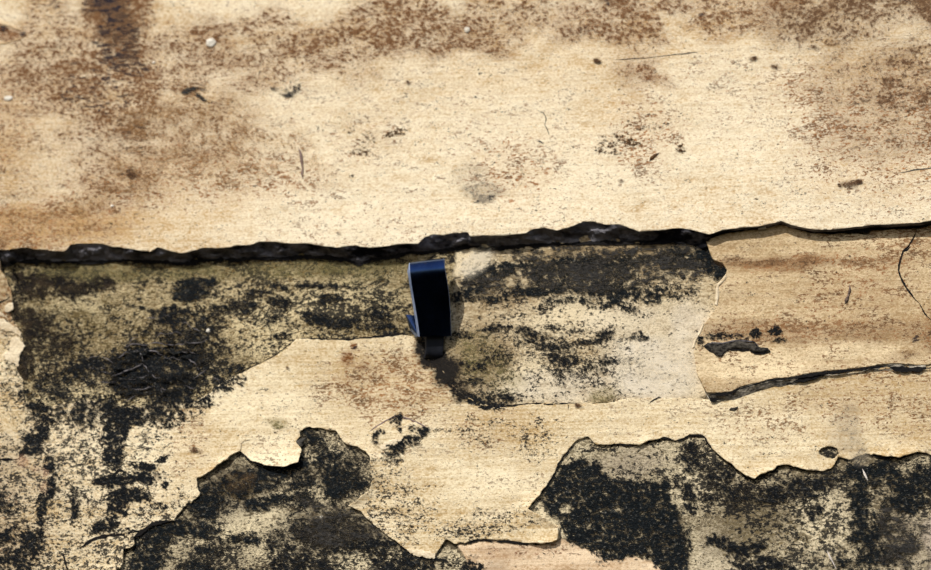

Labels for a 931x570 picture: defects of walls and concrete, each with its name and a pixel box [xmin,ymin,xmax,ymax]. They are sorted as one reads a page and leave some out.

leakage [0,0,931,245]
spalling [0,235,727,407]
crack [0,222,751,267]
crack [773,224,931,320]
leakage [0,272,487,570]
spalling [118,427,931,570]